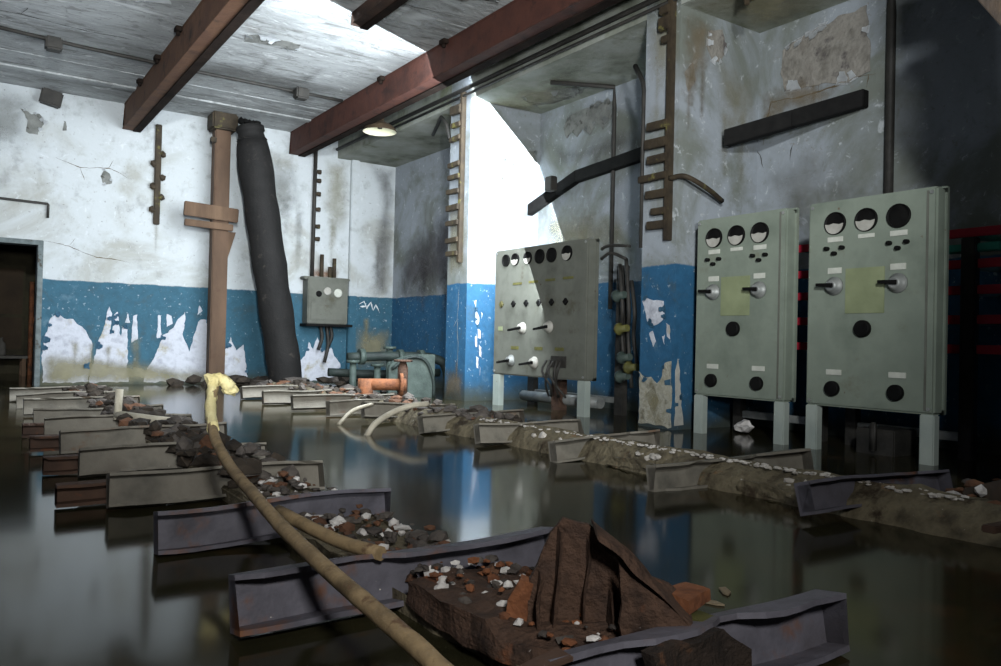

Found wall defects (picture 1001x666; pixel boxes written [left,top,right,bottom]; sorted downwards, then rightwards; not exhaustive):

spalling [781,5,871,94]
peeling [41,306,138,384]
peeling [144,306,207,383]
peeling [225,338,248,377]
peeling [301,337,341,381]
peeling [474,300,483,368]
peeling [642,295,670,347]
spalling [638,361,683,429]